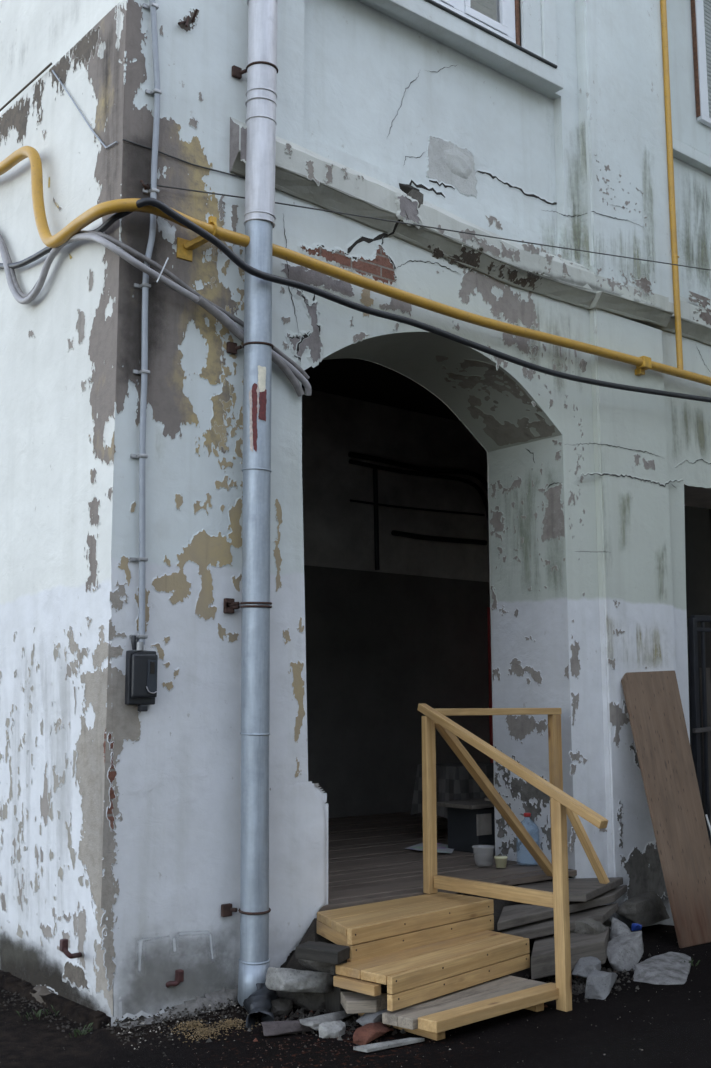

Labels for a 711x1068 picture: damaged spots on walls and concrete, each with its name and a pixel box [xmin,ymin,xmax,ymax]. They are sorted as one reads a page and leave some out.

crack [387,65,454,137]
spalling [394,192,423,229]
crack [400,151,645,229]
spalling [279,241,412,368]
peeling [688,291,711,326]
peeling [427,215,656,574]
crack [576,443,711,488]
peeling [0,0,245,1016]
peeling [288,660,306,743]
peeling [505,715,548,744]
peeling [494,746,551,859]
peeling [598,798,668,902]